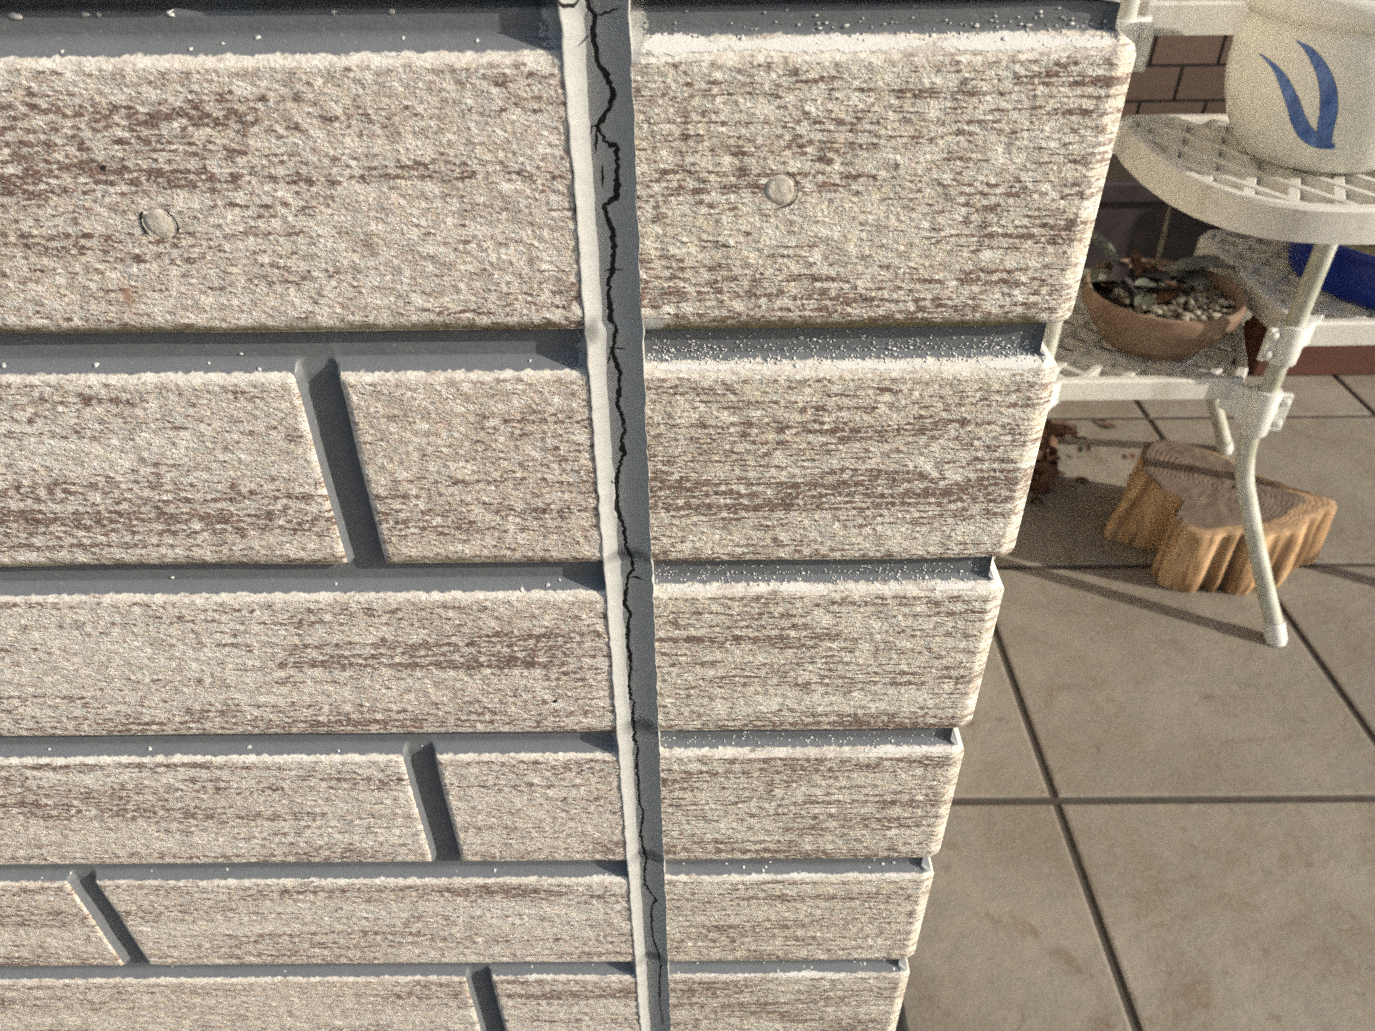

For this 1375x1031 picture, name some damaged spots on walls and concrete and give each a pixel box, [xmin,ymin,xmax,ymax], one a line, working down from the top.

crack [556,0,663,1021]